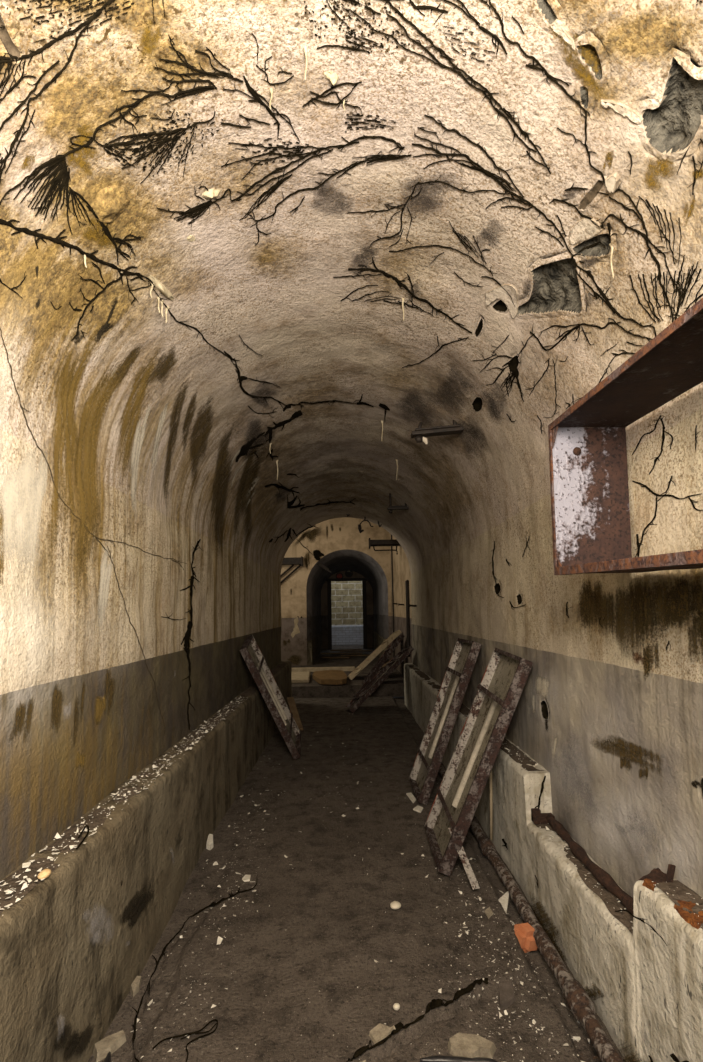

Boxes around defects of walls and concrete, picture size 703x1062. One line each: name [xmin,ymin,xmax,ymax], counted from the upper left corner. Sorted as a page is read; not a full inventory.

damp [134,110,223,176]
damp [201,188,221,199]
crack [0,0,703,557]
spalling [474,172,620,338]
spalling [529,0,703,162]
damp [0,299,269,583]
crack [0,328,202,730]
damp [98,548,112,623]
damp [579,580,703,676]
damp [593,737,661,778]
crack [132,874,258,1062]
crack [346,978,488,1062]